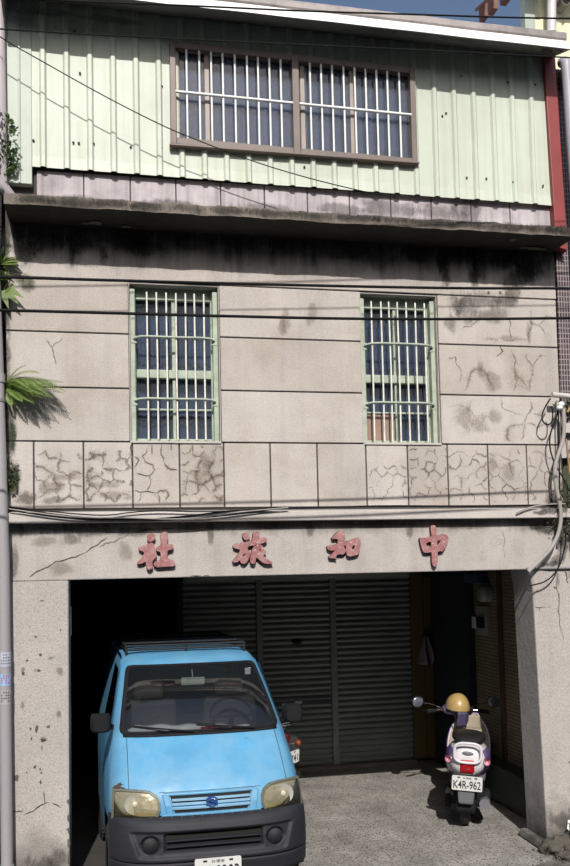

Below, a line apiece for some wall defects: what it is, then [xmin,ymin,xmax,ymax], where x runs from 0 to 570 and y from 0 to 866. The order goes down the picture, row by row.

leakage [0,230,92,263]
leakage [437,248,540,285]
crack [134,446,177,503]
crack [31,528,174,576]